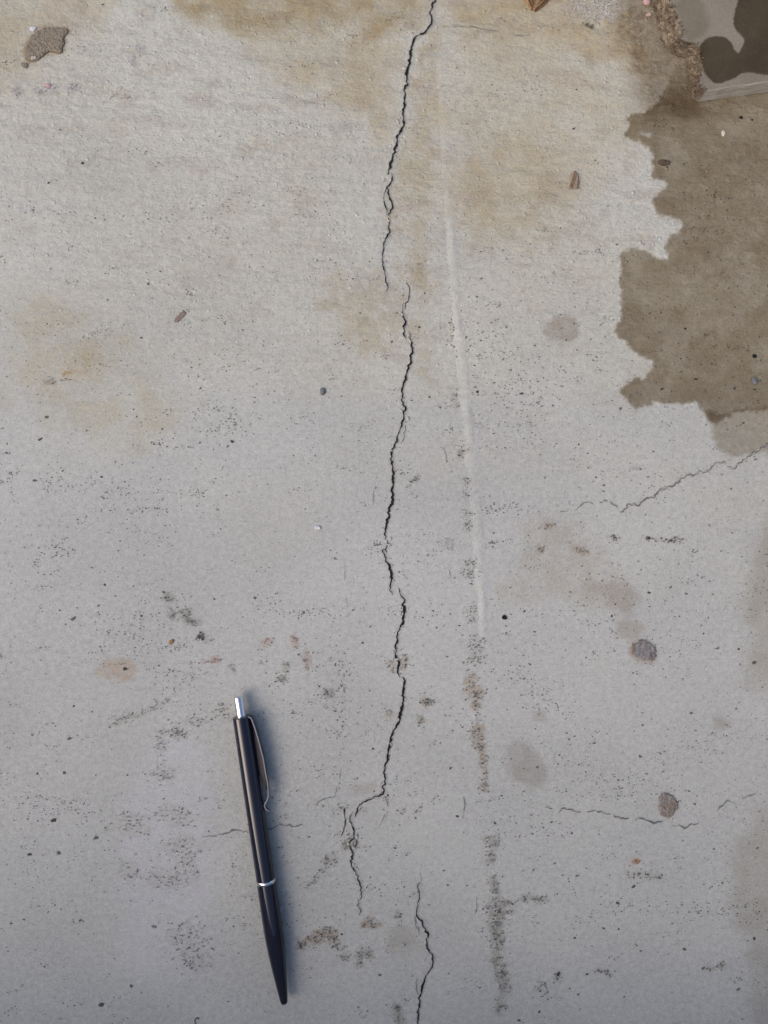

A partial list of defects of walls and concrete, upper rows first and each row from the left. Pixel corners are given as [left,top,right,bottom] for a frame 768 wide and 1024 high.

crack [205,0,530,914]
crack [560,443,768,513]
crack [414,873,434,1024]